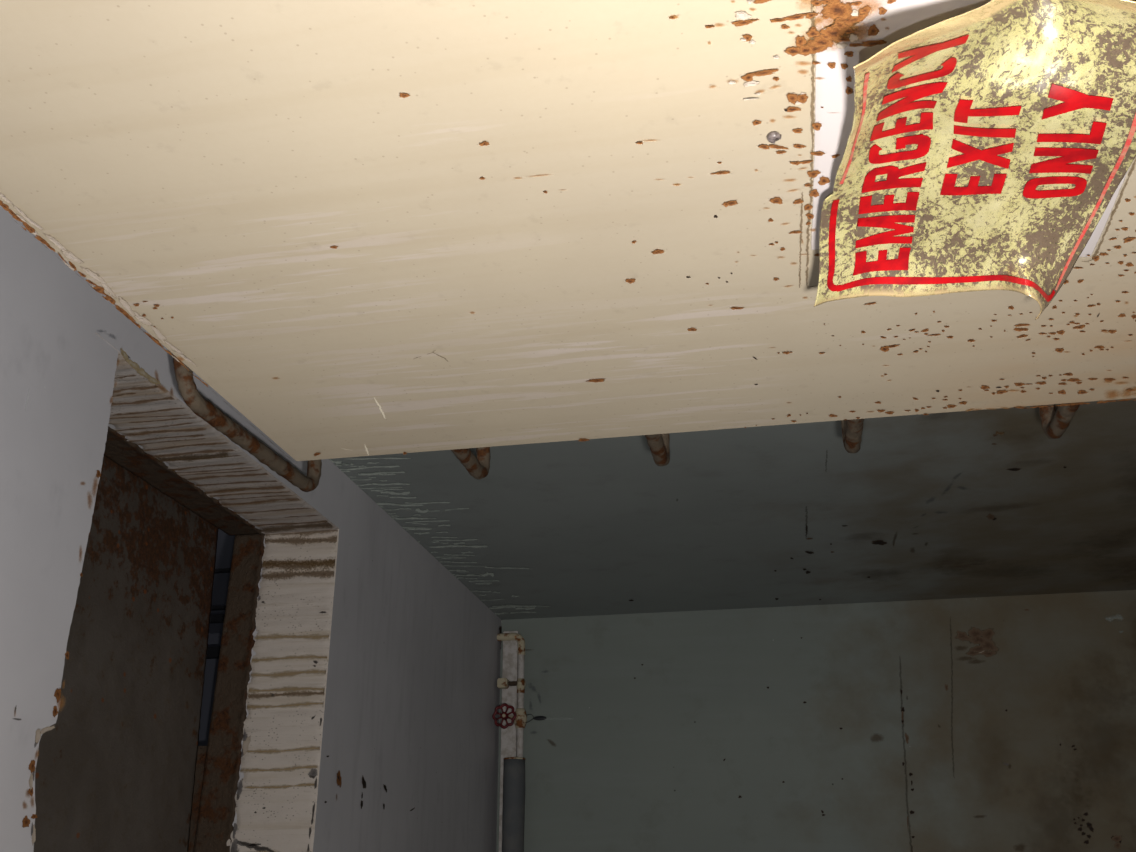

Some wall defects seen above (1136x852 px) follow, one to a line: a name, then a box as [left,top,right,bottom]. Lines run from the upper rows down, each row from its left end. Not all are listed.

corrosion [705,0,896,264]
corrosion [0,193,287,456]
corrosion [981,370,1136,409]
corrosion [53,683,64,717]
corrosion [22,787,38,828]